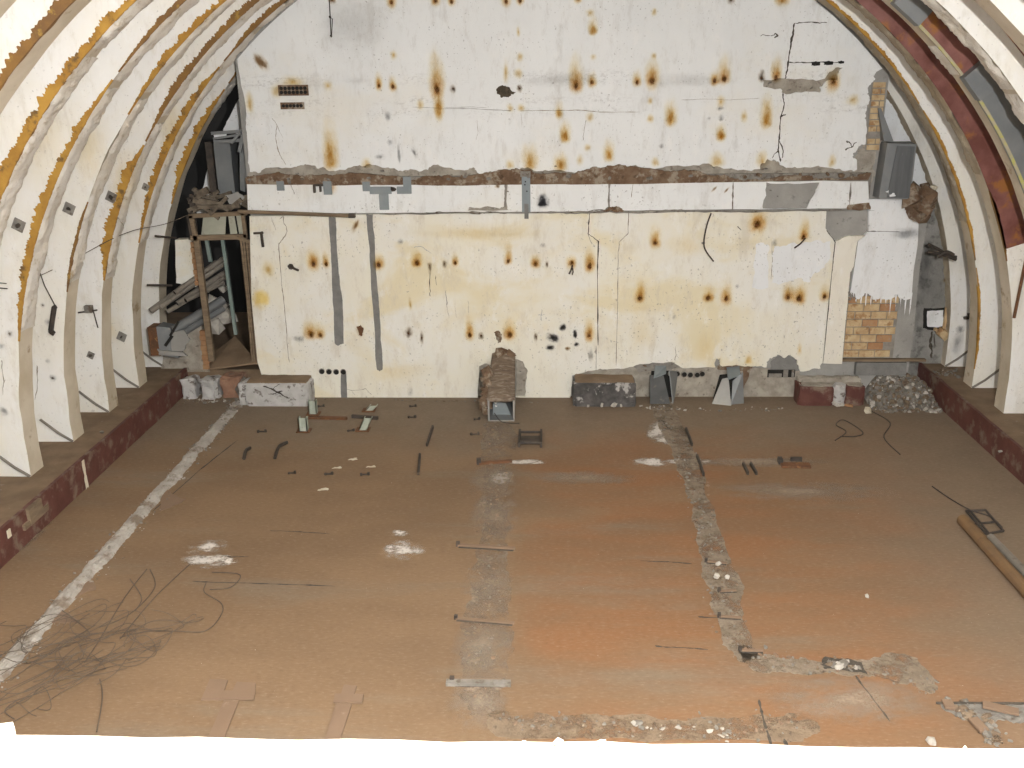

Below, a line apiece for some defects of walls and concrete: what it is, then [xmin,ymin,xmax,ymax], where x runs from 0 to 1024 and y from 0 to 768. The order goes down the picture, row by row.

spalling [248,164,491,176]
rust [245,164,871,186]
spalling [657,82,890,210]
crack [761,22,839,162]
peeling [826,0,981,369]
spalling [770,355,800,371]
flaking render [832,293,900,407]